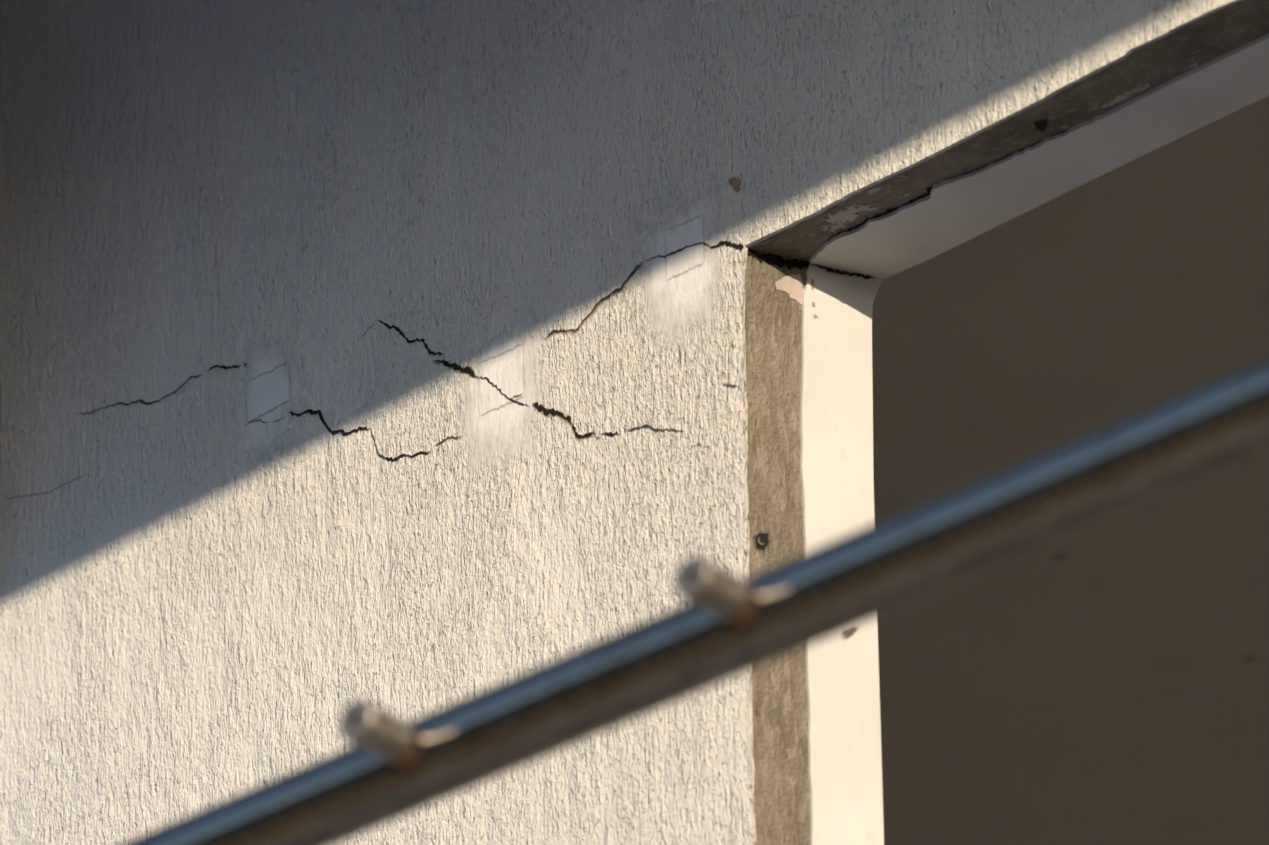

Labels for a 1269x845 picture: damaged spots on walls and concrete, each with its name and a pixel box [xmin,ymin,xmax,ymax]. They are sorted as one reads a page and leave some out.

crack [80,362,248,415]
crack [361,320,706,447]
crack [246,409,460,462]